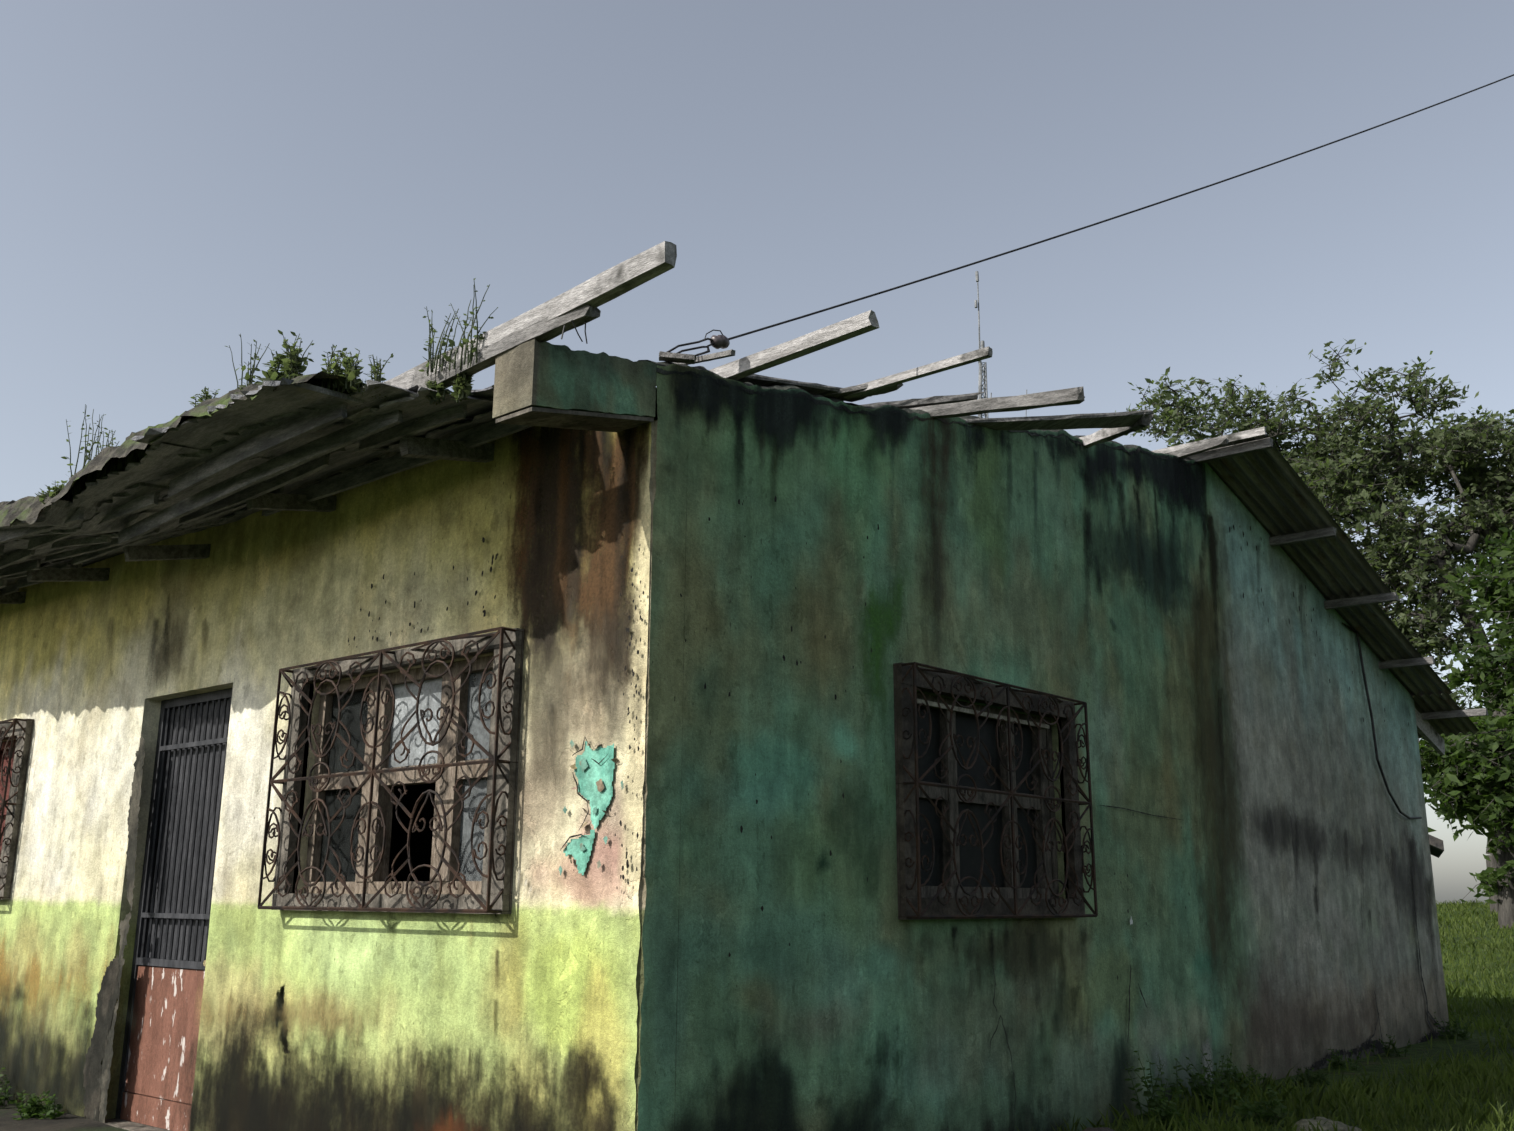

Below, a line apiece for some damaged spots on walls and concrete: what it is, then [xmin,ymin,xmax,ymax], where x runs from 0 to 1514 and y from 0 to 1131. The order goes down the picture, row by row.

damp [672,366,911,471]
damp [923,418,1011,621]
peeling [559,544,644,894]
damp [1394,840,1434,950]
damp [0,988,90,1115]
damp [188,998,614,1131]
damp [675,1049,798,1131]